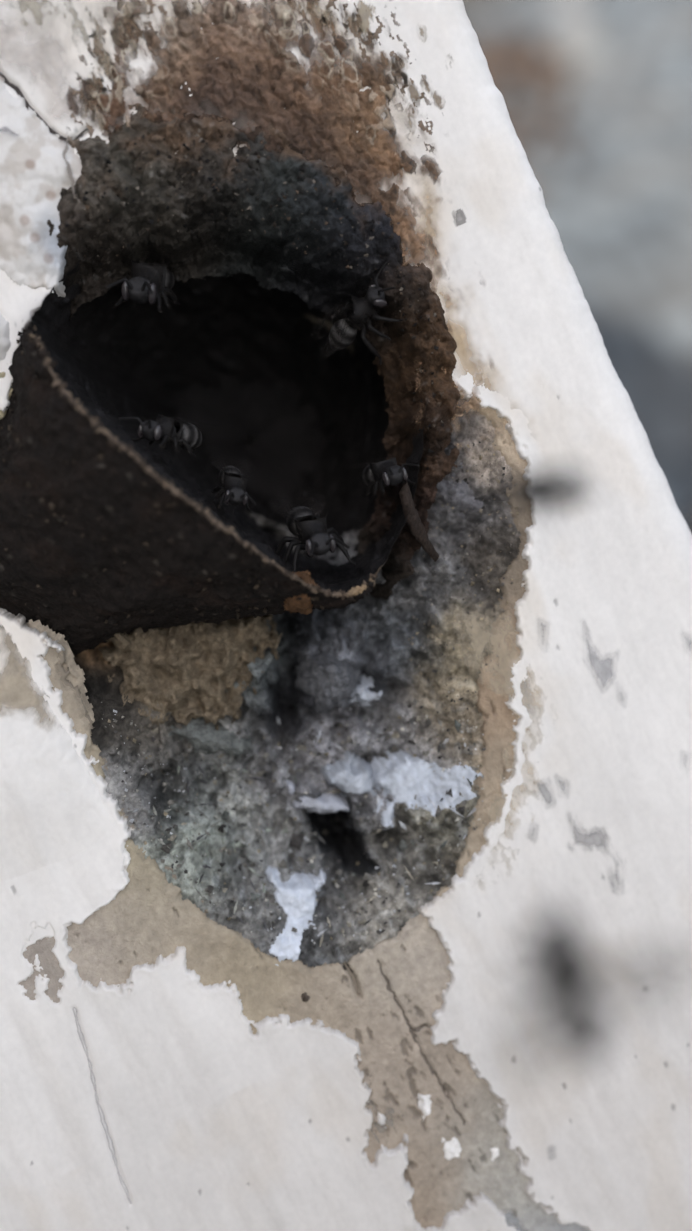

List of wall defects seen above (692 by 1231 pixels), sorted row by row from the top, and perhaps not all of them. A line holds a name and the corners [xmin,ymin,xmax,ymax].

peeling [18,0,90,41]
crack [0,73,93,209]
water stain [67,0,442,293]
water stain [442,367,481,428]
spalling [18,391,590,1231]